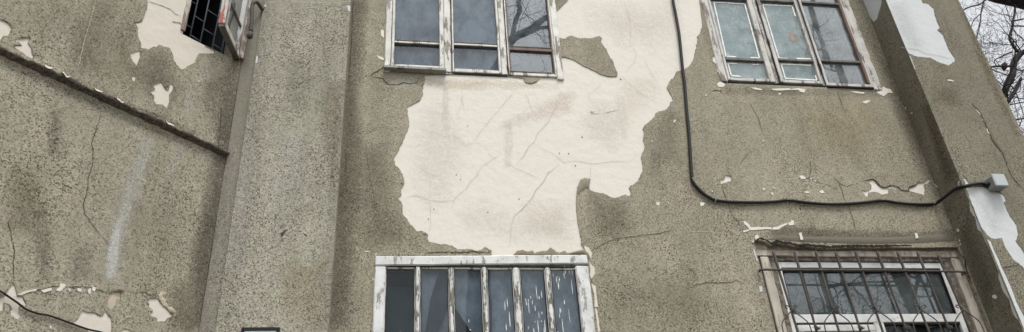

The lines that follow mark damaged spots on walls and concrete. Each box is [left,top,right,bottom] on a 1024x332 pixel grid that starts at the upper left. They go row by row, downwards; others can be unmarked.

peeling [0,20,70,77]
peeling [130,0,214,70]
peeling [863,0,955,69]
peeling [150,82,174,126]
crack [83,115,110,246]
crack [409,92,640,253]
peeling [394,0,702,332]
peeling [862,179,937,196]
peeling [743,220,803,292]
peeling [958,179,1024,328]
peeling [0,283,96,319]
peeling [72,292,130,332]